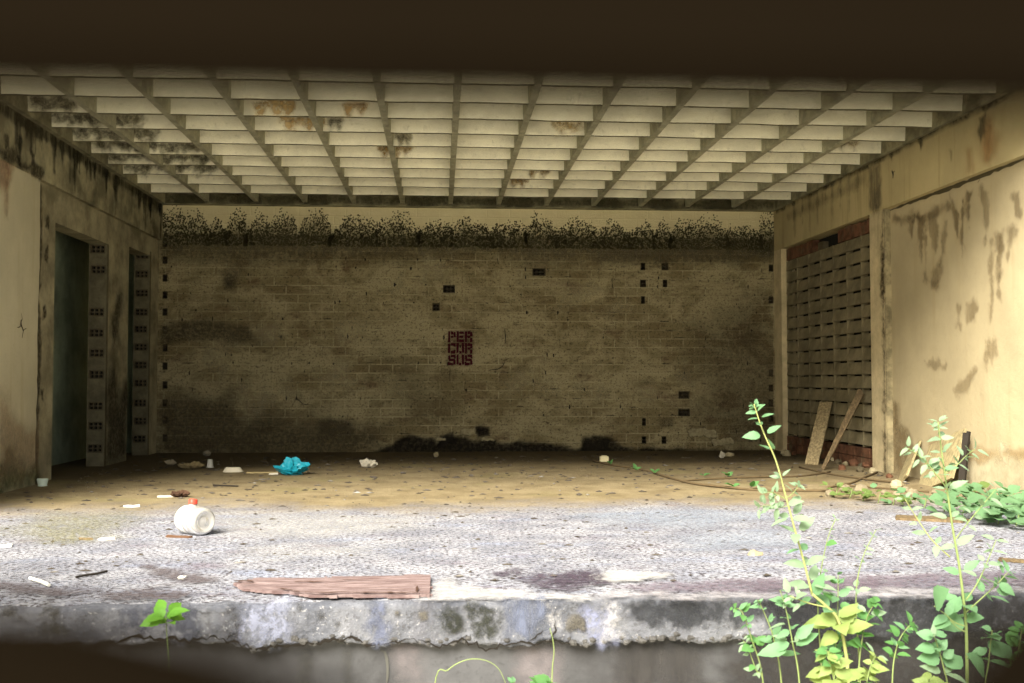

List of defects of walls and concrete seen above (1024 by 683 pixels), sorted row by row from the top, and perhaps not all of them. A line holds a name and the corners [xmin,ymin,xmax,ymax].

water stain [0,112,942,288]
water stain [161,320,252,344]
water stain [157,395,704,453]
spalling [541,614,606,648]
spalling [619,632,758,646]